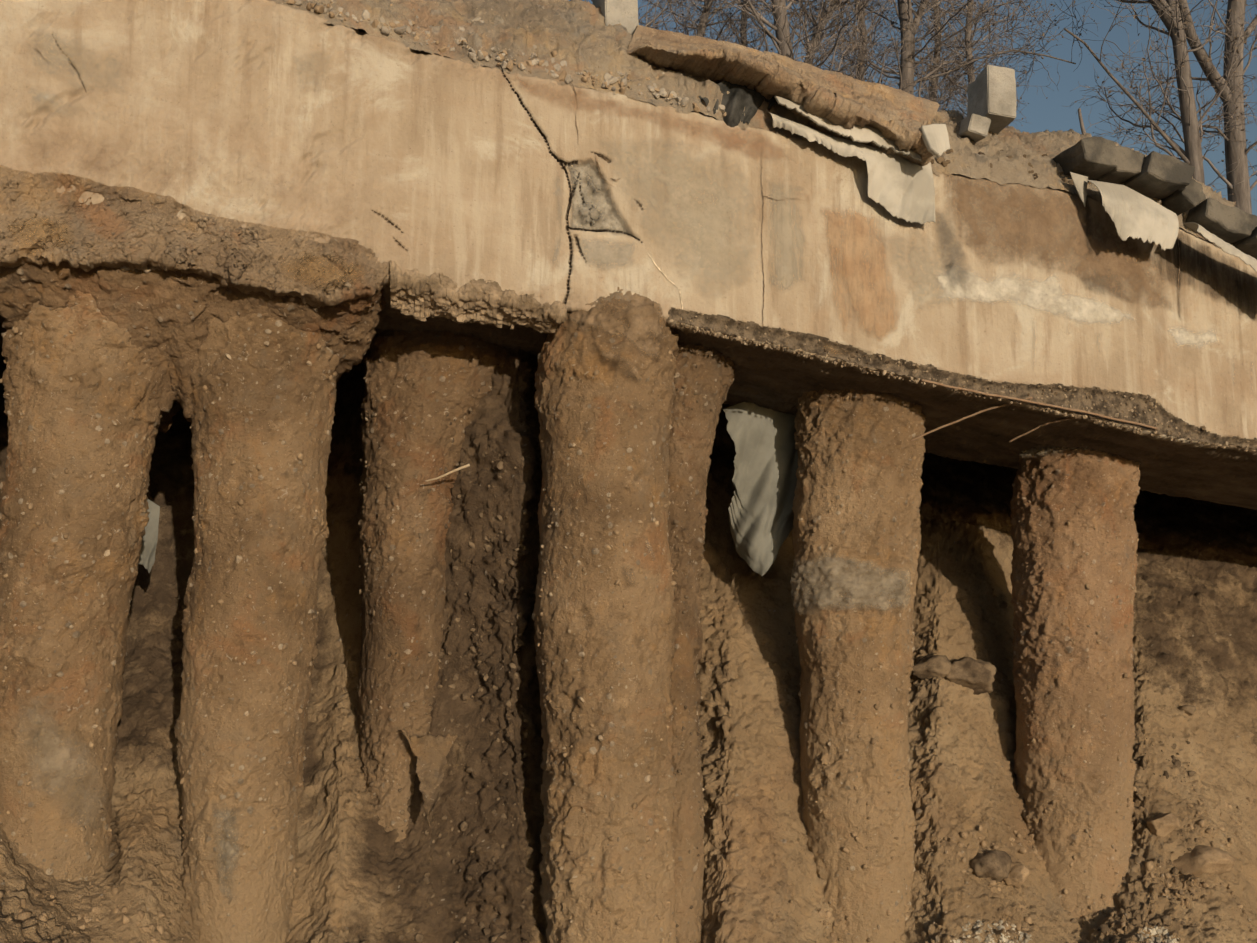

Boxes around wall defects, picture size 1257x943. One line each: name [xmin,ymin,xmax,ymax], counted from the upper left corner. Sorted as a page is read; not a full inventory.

crack [498,62,683,310]
spalling [557,162,627,234]
damp [1149,233,1257,320]
spalling [390,260,1257,457]
damp [1170,329,1216,344]